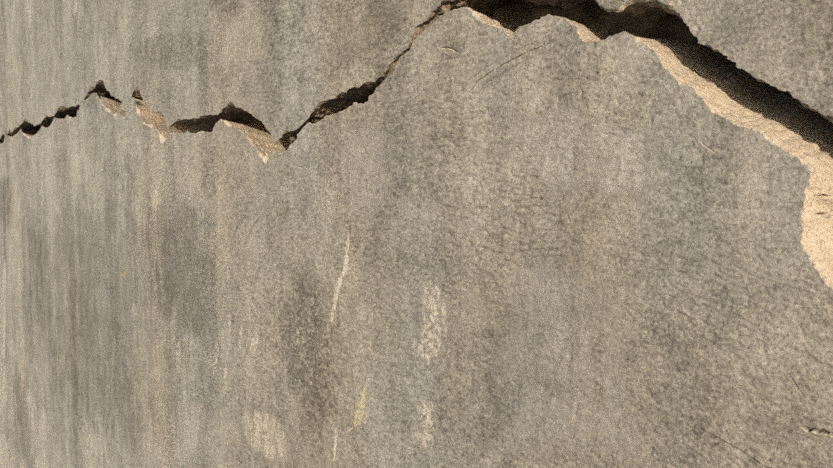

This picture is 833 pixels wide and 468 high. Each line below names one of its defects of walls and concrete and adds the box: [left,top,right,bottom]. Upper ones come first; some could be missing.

crack [0,0,833,290]
crack [692,421,820,468]